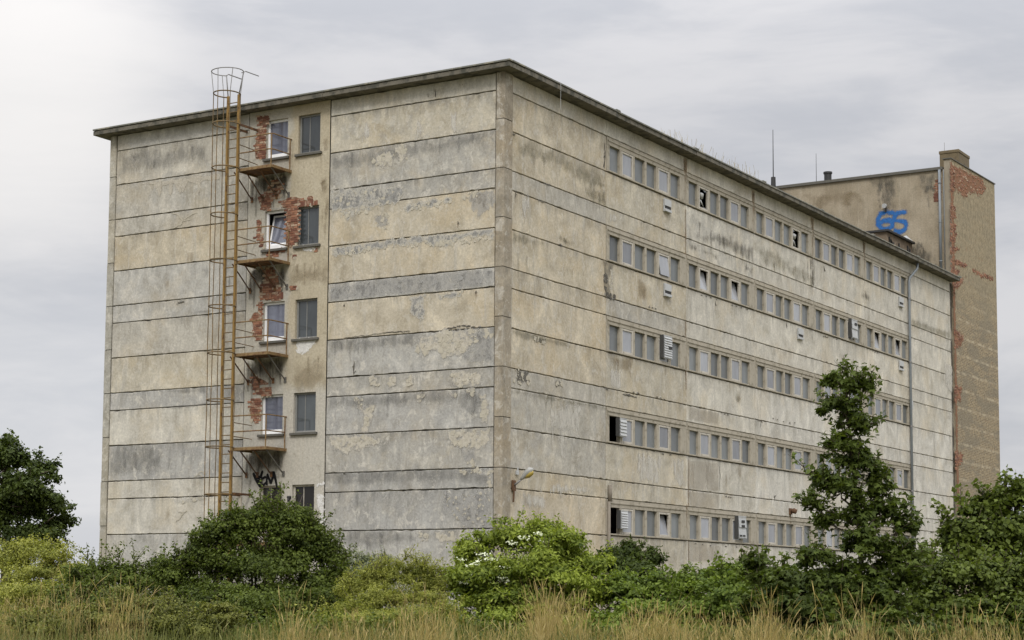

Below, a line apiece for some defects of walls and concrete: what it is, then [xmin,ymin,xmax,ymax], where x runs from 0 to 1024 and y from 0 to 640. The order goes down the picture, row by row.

spalling [252,113,270,160]
spalling [249,175,318,341]
peeling [295,337,316,355]
spalling [933,161,994,510]